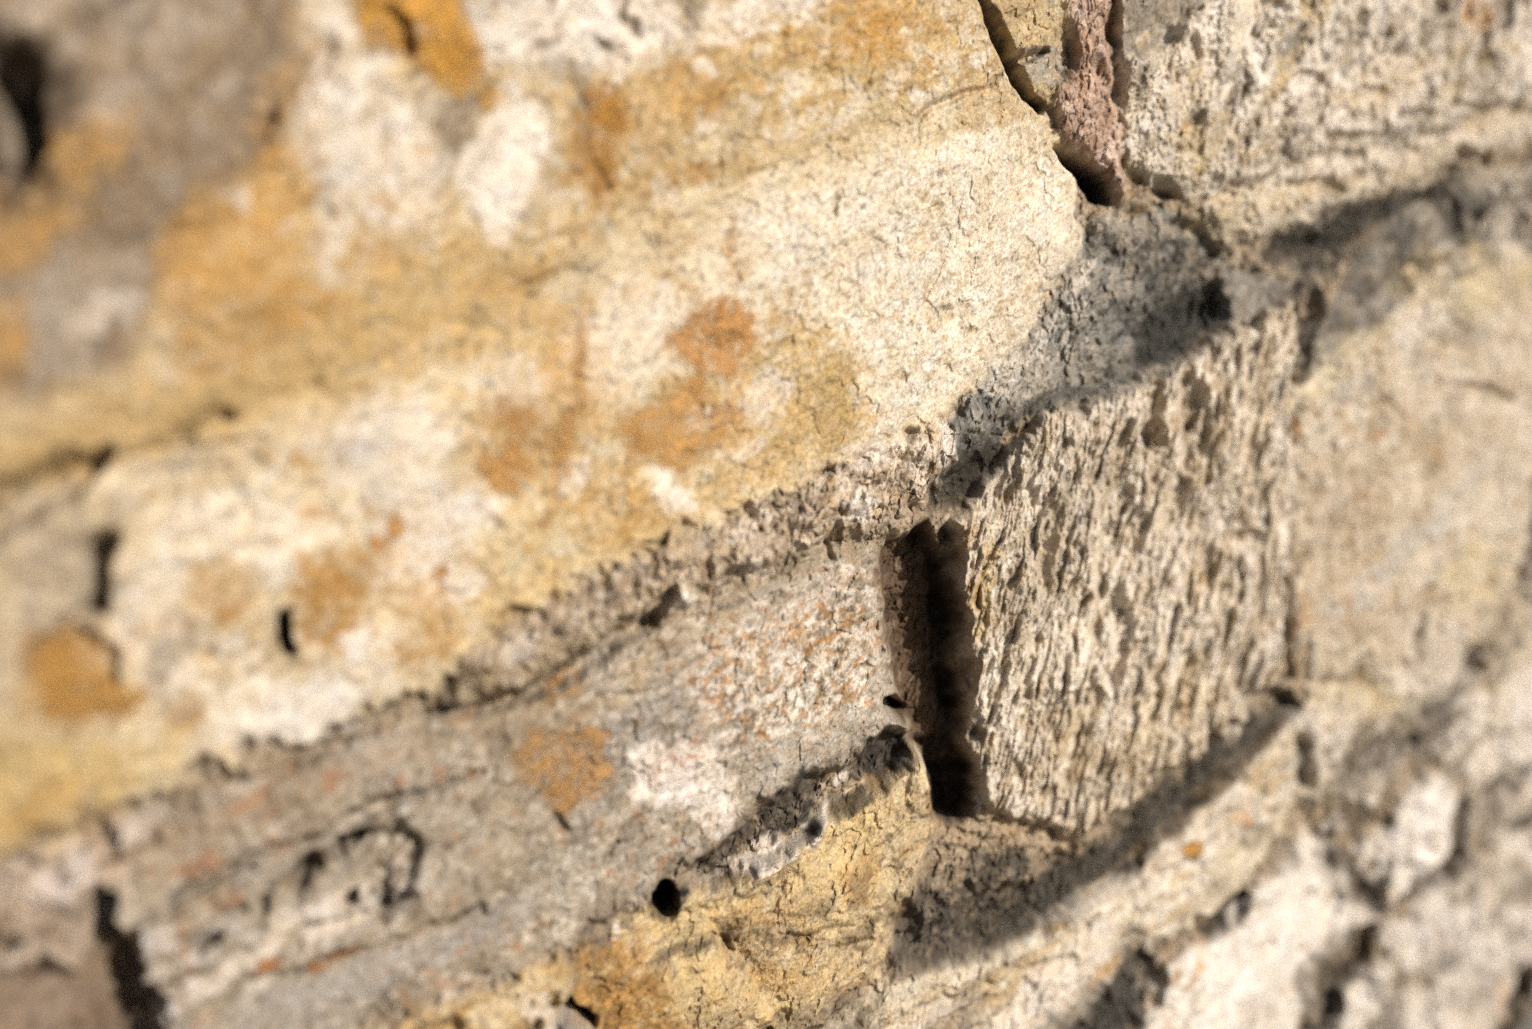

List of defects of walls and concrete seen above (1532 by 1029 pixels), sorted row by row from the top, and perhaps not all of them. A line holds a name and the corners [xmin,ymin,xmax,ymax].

crack [914,0,1050,122]